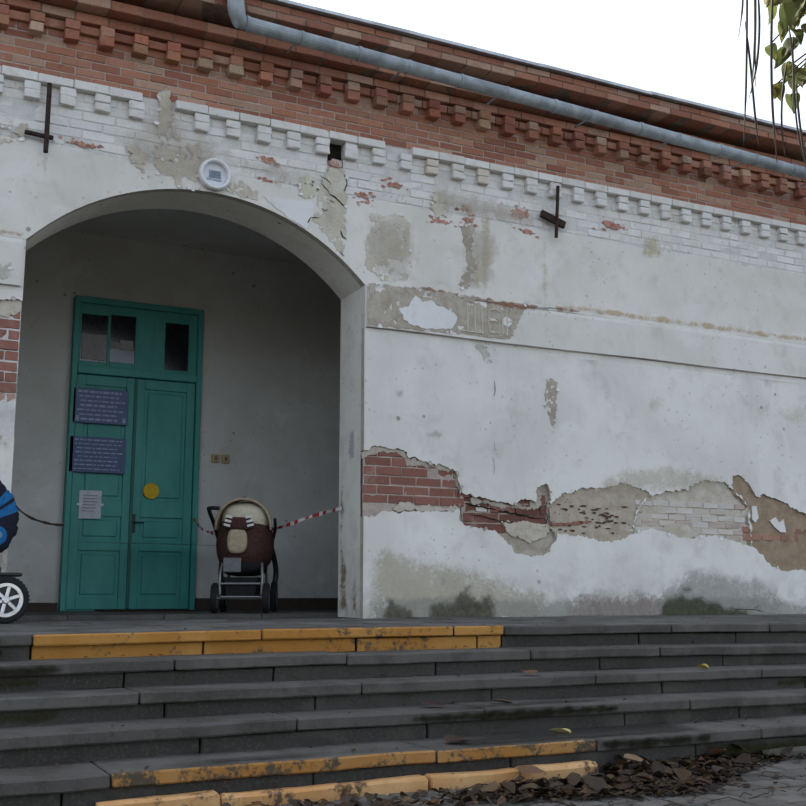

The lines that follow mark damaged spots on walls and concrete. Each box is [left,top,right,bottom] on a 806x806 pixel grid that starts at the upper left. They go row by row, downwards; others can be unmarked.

peeling [126,90,204,191]
peeling [298,144,527,363]
spalling [0,296,22,440]
spalling [361,446,806,571]
mould [384,601,412,618]
mould [430,591,493,617]
leakage [573,578,778,616]